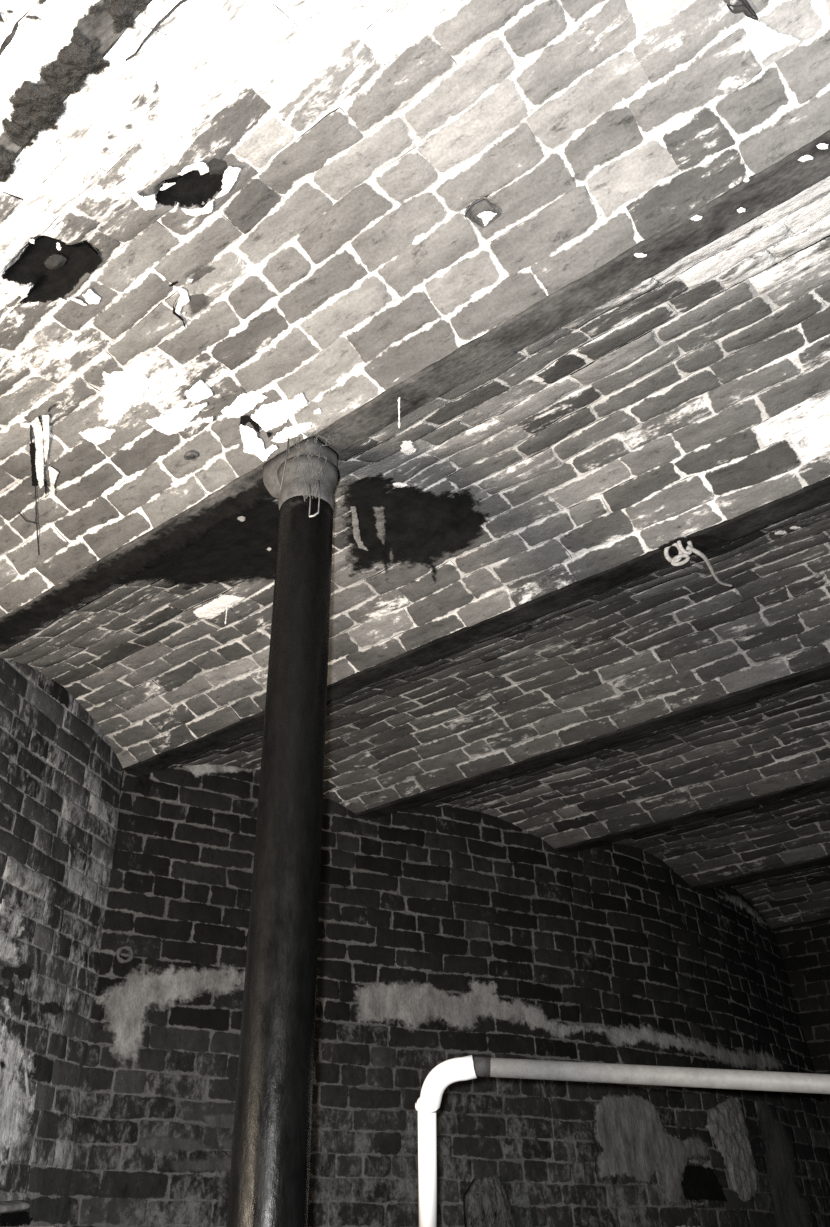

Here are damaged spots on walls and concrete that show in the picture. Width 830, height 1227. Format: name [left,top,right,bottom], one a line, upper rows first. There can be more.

spalling [0,0,47,47]
rust [88,0,147,33]
rust [0,28,110,182]
spalling [131,158,241,217]
spalling [1,235,102,306]
peeling [79,427,115,445]
peeling [146,380,321,443]
leakage [339,473,490,582]